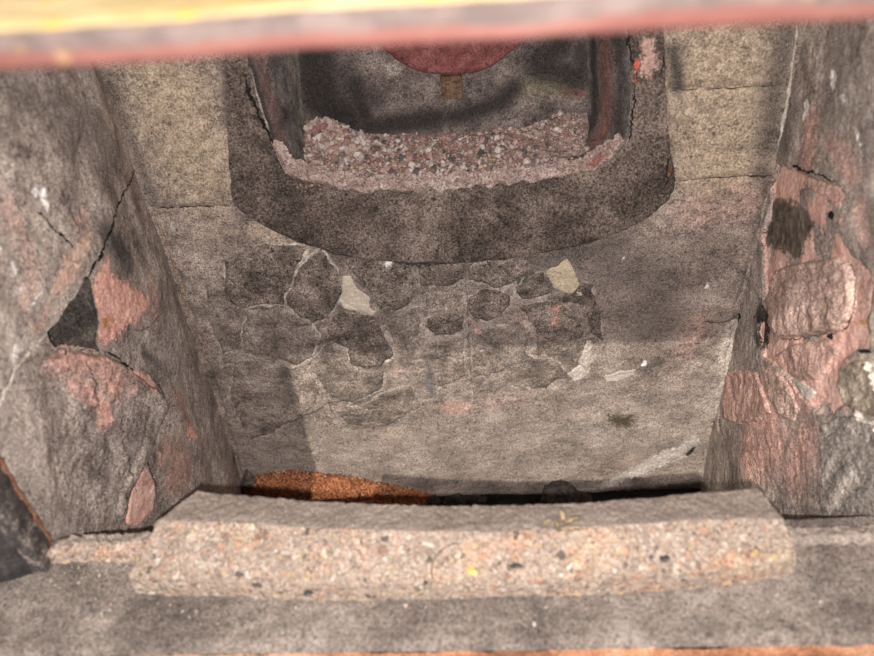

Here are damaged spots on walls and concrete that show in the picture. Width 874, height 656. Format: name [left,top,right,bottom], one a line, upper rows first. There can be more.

crack [36,210,75,248]
crack [87,169,135,277]
spalling [47,255,159,352]
spalling [128,368,157,387]
efflorescence [863,362,874,391]
efflorescence [853,410,874,432]